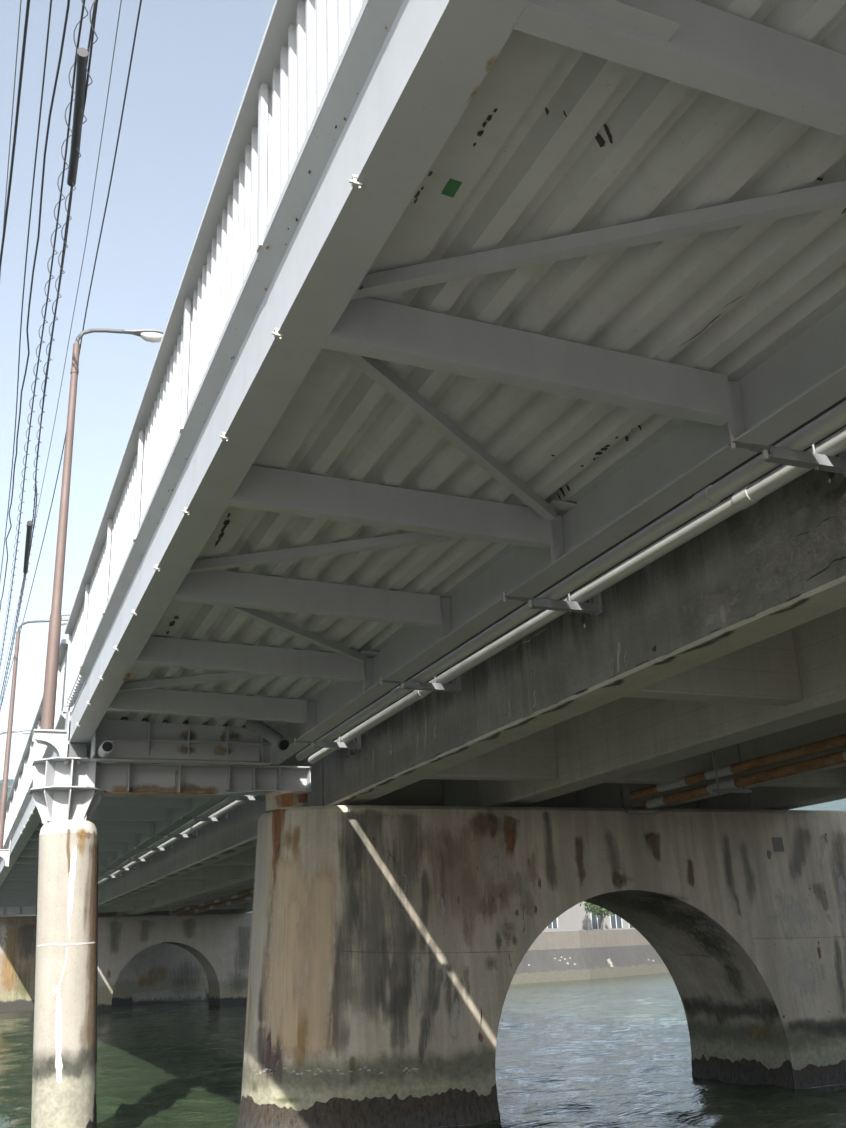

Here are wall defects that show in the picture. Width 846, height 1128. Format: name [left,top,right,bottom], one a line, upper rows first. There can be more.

peeling [595,124,613,148]
water stain [654,600,732,665]
water stain [483,690,572,741]
corrosion [272,793,307,880]
corrosion [471,812,516,852]
water stain [576,838,585,883]
water stain [33,842,251,1084]
water stain [245,750,459,1077]
water stain [789,837,846,1034]
water stain [683,999,779,1022]